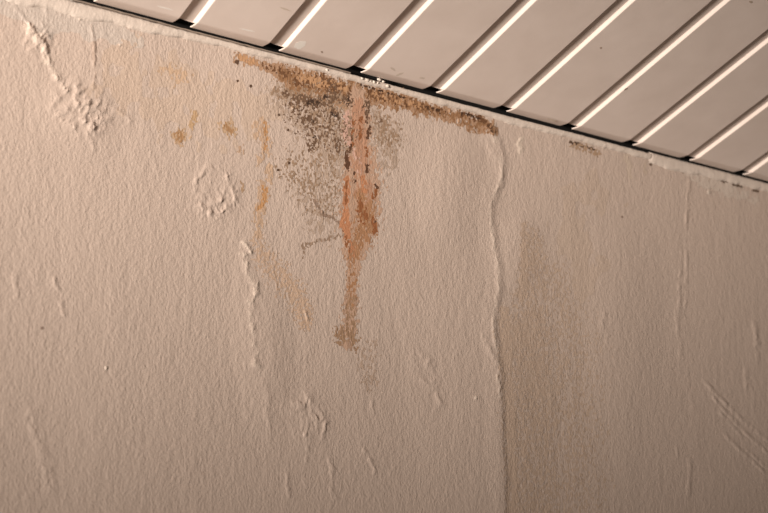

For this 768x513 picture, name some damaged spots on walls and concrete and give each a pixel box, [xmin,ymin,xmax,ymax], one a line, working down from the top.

damp [82,33,498,259]
rust [332,85,391,354]